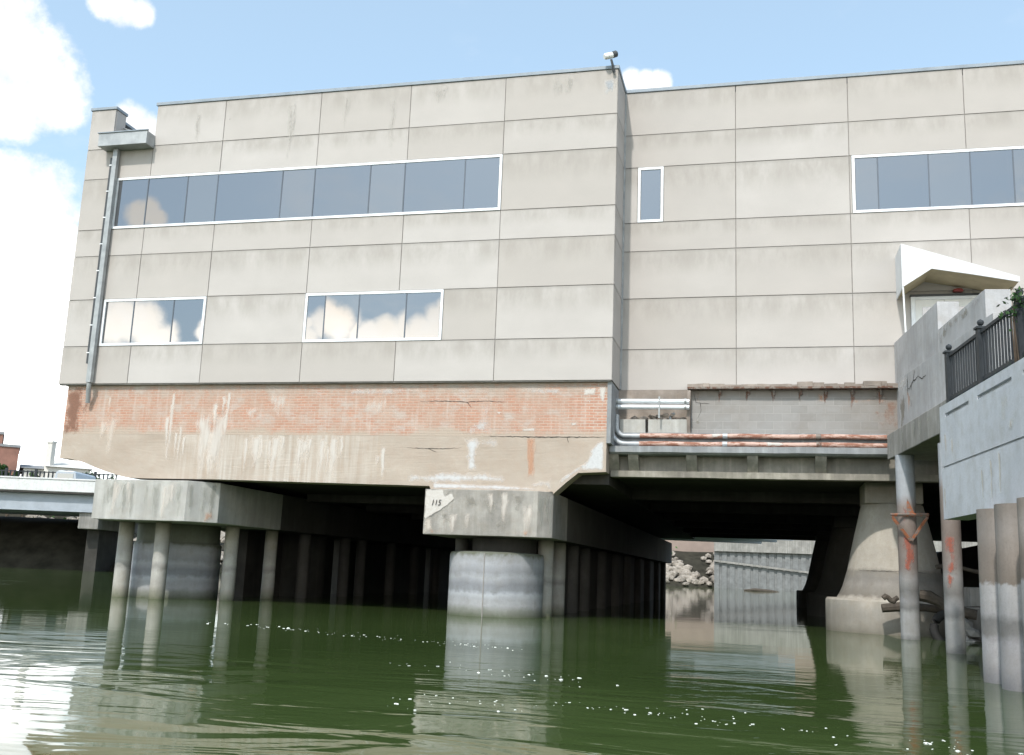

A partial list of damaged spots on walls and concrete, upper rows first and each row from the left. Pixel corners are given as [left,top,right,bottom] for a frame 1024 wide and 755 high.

water stain [165,394,185,457]
water stain [198,393,230,471]